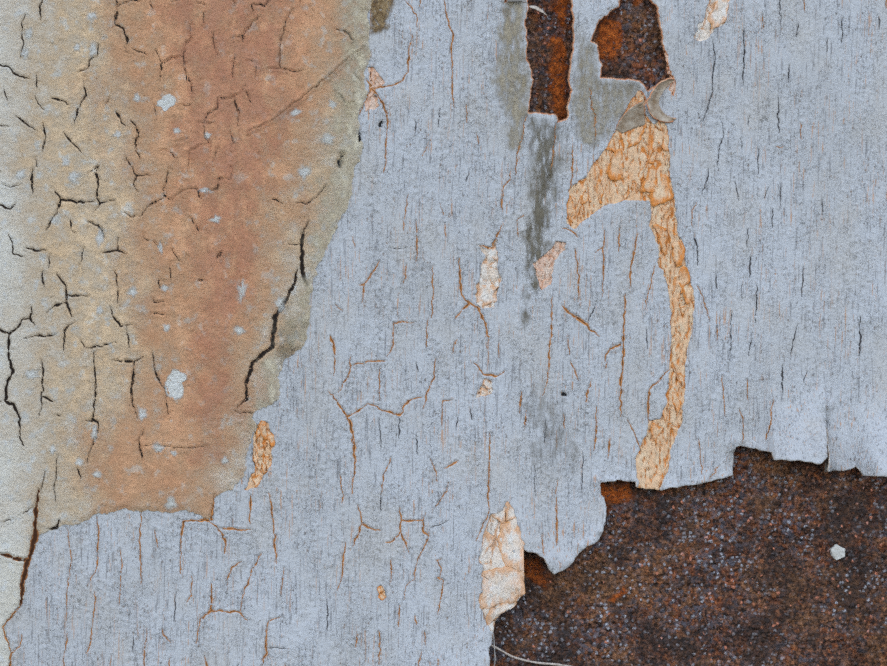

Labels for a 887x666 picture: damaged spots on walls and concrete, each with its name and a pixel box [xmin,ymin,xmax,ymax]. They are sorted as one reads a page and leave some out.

spalling [156,94,176,111]
spalling [364,67,385,112]
crack [0,0,305,666]
spalling [165,369,187,400]
spalling [244,421,275,490]
crack [236,184,327,414]
crack [327,196,472,666]
crack [455,258,504,377]
crack [476,433,491,540]
crack [519,228,669,492]
peeling [398,0,887,666]
rust [489,446,887,666]